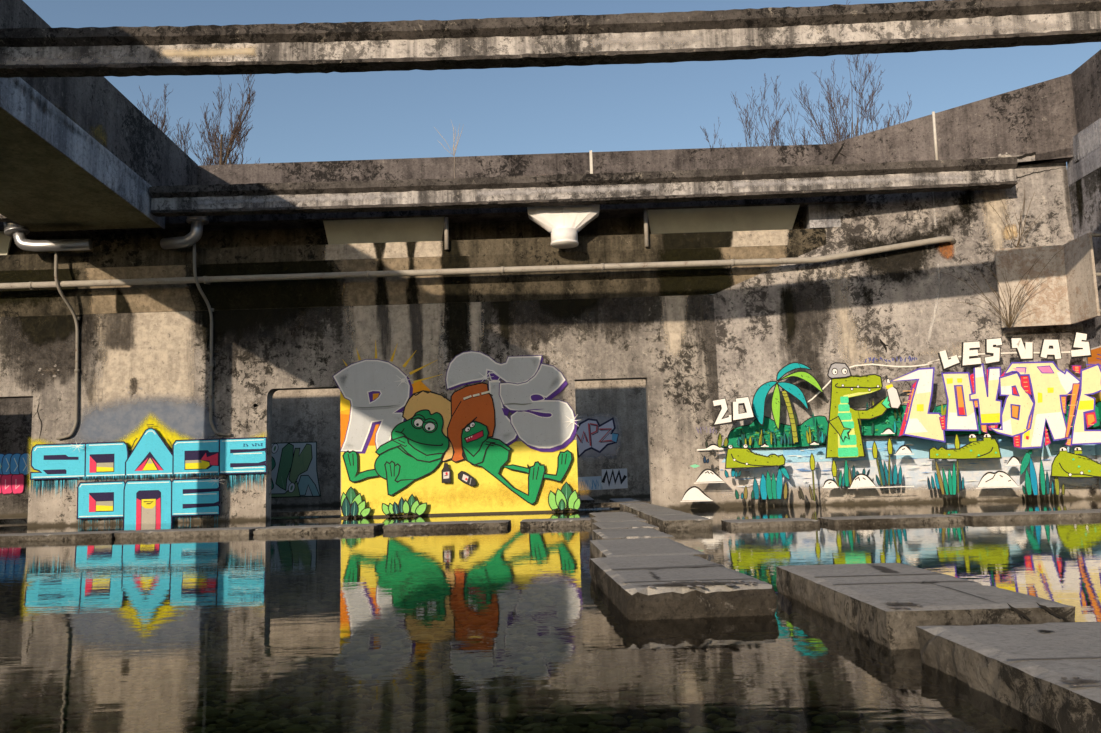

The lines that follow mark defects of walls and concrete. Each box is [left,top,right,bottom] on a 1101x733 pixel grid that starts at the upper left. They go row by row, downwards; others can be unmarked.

leakage [733,174,1017,249]
leakage [1064,156,1084,229]
leakage [715,229,789,285]
leakage [5,265,332,413]
leakage [325,240,720,428]
leakage [780,278,881,409]
crack [922,581,1067,621]